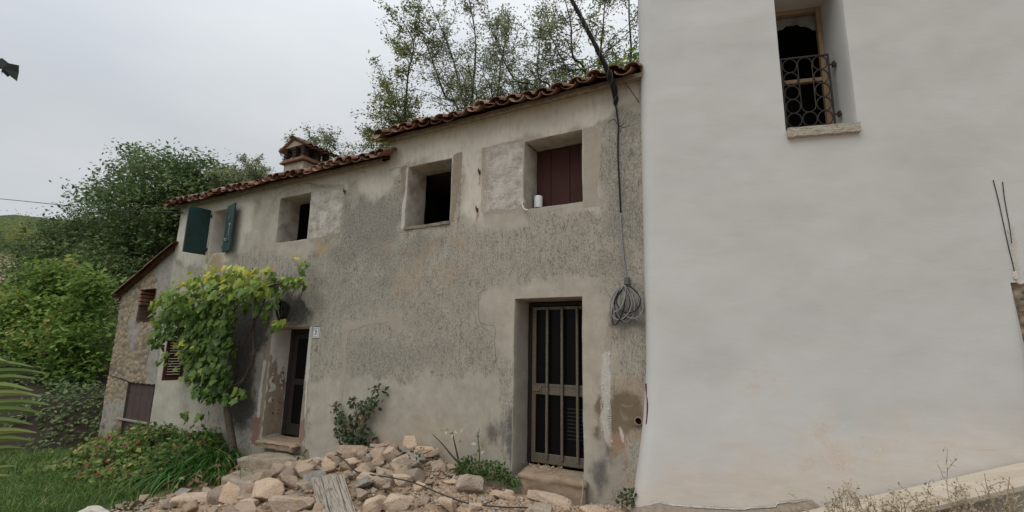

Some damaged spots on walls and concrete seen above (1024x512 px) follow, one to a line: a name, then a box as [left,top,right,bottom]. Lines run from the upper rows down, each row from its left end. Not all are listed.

peeling [251,340,286,444]
peeling [600,326,613,447]
water stain [594,392,643,442]